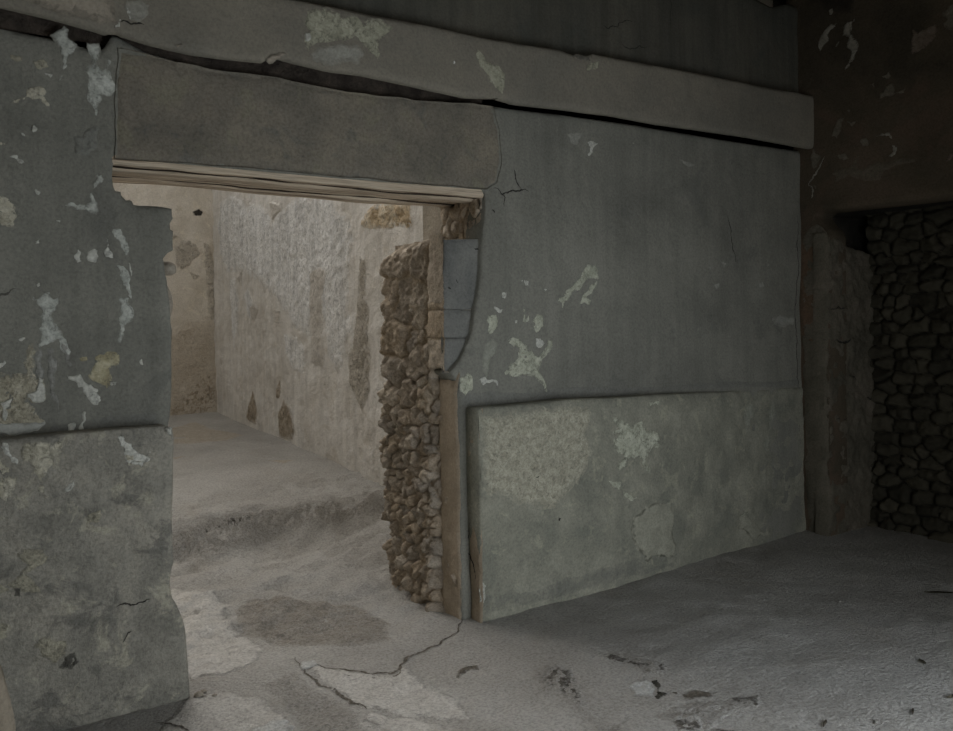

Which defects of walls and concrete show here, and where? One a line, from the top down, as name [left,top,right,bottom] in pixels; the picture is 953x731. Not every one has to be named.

spalling [10,54,52,107]
spalling [0,195,17,227]
crack [497,170,528,204]
flaking render [74,229,130,263]
spalling [558,264,599,308]
spalling [504,308,553,392]
spalling [0,328,120,501]
spalling [479,403,593,510]
spalling [609,416,660,502]
flaking render [631,501,676,565]
crack [294,619,463,709]